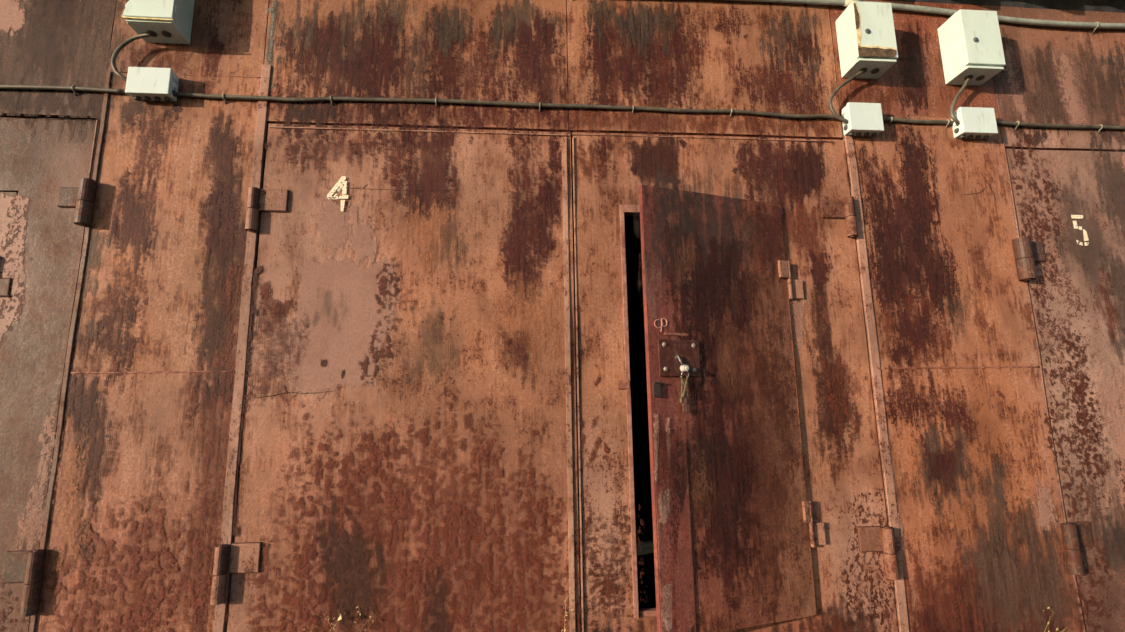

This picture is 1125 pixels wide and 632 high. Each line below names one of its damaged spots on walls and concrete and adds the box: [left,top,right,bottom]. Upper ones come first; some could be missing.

rust [122,10,225,94]
peeling [0,193,32,341]
rust [40,97,250,632]
rust [244,0,1063,632]
rust [1090,277,1118,340]